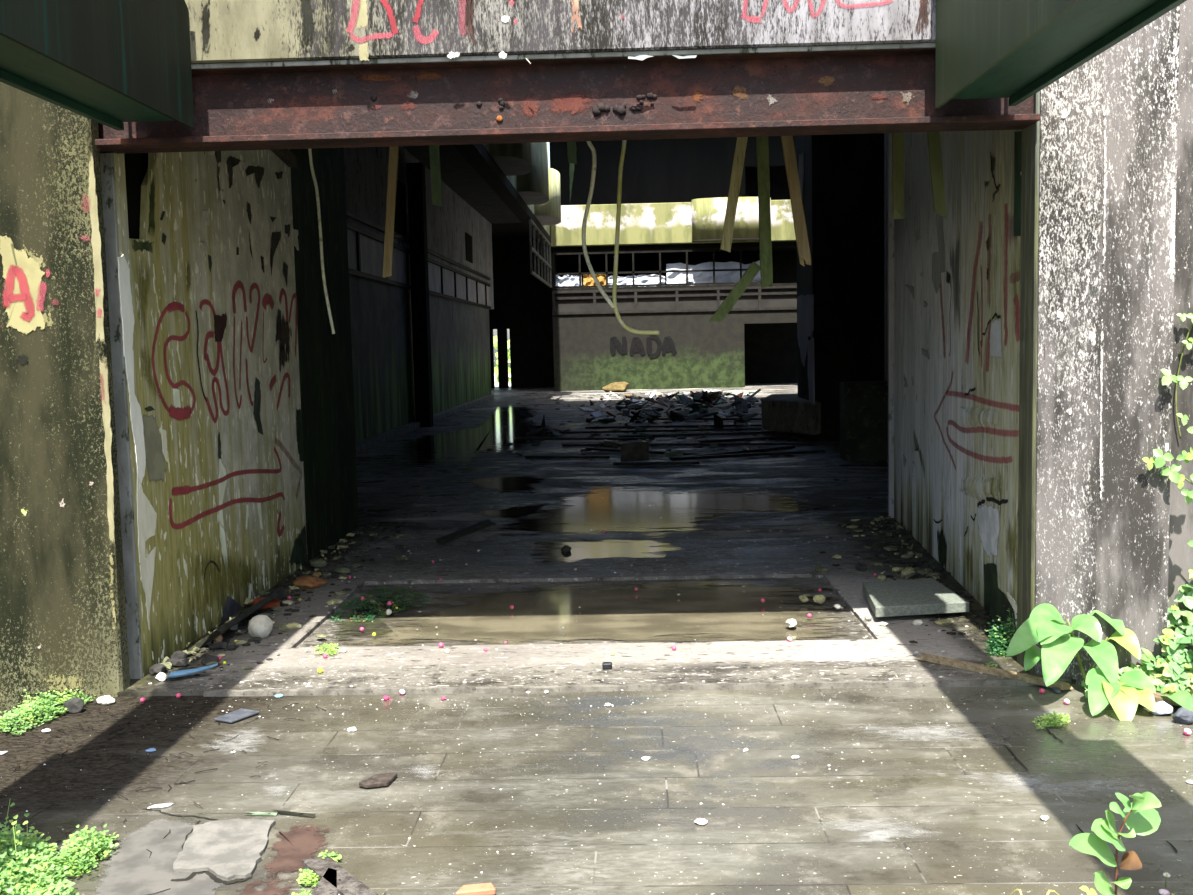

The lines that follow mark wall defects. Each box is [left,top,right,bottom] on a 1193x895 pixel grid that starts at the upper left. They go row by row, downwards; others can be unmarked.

damp [201,0,210,56]
damp [300,0,316,55]
damp [349,42,369,61]
damp [356,0,368,28]
corrosion [521,101,538,115]
corrosion [552,91,657,116]
peeling [0,235,56,335]
peeling [88,156,105,341]
spalling [124,153,148,239]
damp [1169,179,1177,279]
peeling [117,254,168,622]
peeling [99,358,117,646]